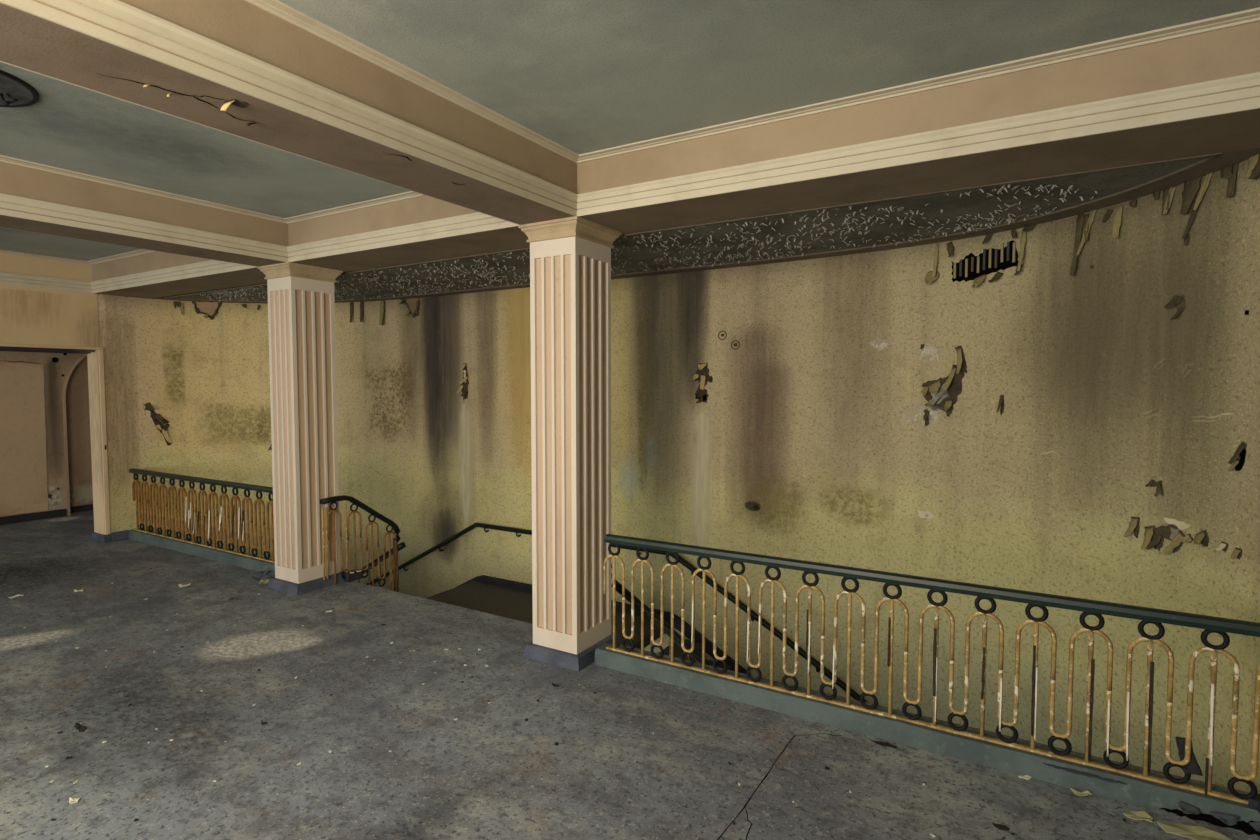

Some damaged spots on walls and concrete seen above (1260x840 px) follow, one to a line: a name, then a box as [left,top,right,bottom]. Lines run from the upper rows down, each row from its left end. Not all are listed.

crack [99,74,261,124]
spalling [611,184,1137,288]
peeling [144,402,171,446]
leakage [425,295,471,551]
leakage [514,288,531,405]
leakage [682,270,704,378]
leakage [694,411,710,547]
peeling [693,363,713,403]
peeling [920,344,967,426]
peeling [1227,442,1247,471]
peeling [1123,516,1242,560]
crack [717,733,840,840]